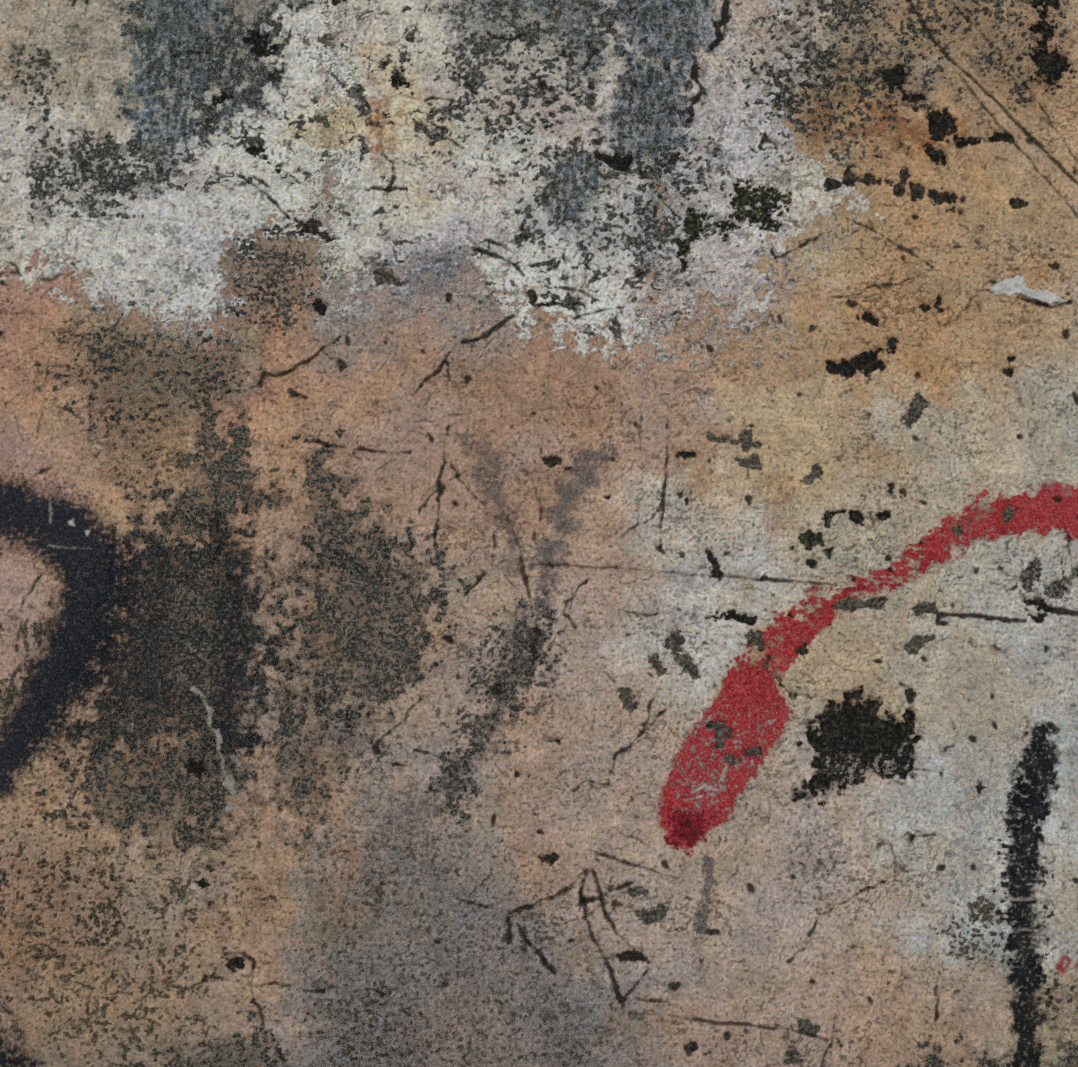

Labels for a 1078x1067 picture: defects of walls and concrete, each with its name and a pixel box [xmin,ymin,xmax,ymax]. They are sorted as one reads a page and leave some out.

crack [833,221,932,298]
peeling [989,275,1073,308]
crack [468,870,648,1007]